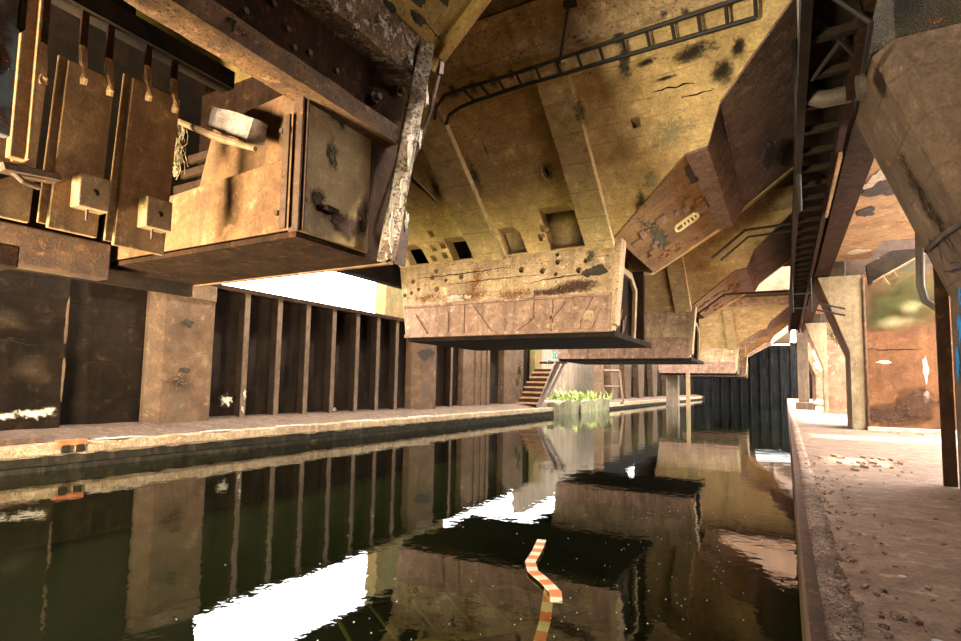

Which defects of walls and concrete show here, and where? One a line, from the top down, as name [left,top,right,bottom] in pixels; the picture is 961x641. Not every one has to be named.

corrosion [0,6,12,74]
peeling [361,0,414,66]
peeling [410,0,426,27]
peeling [407,126,422,167]
corrosion [312,188,368,240]
peeling [389,178,409,253]
spalling [581,264,608,277]
spalling [447,294,471,302]
damp [0,407,56,420]